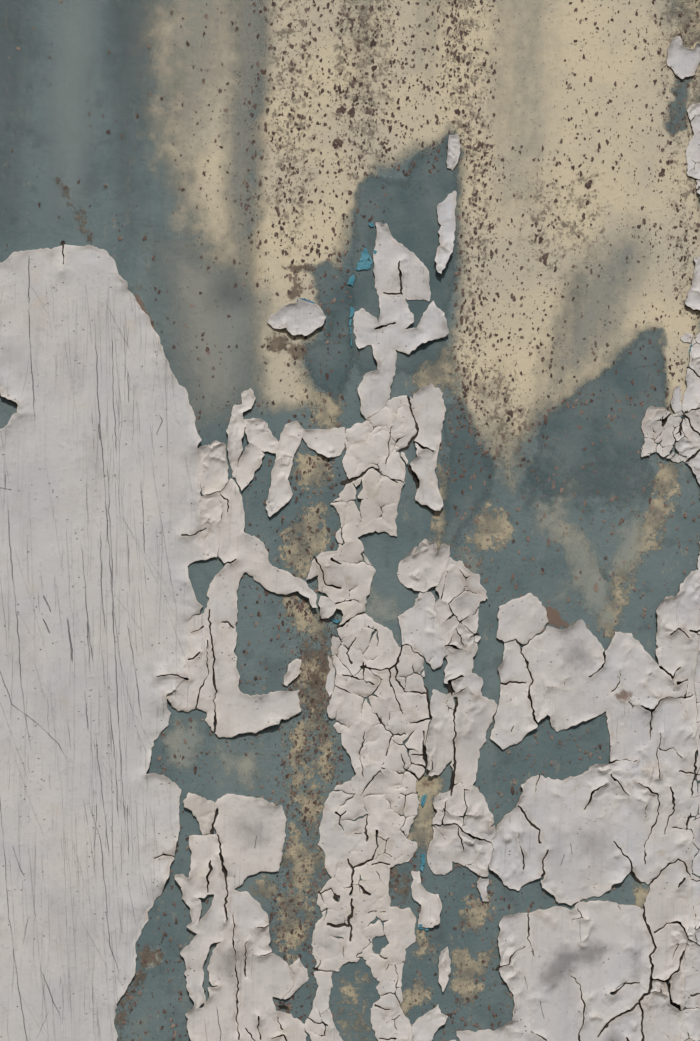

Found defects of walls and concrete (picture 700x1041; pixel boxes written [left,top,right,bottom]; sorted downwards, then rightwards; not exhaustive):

corrosion [134,0,700,634]
peeling [148,0,700,1041]
crack [661,412,700,462]
corrosion [115,811,193,1041]
corrosion [157,575,345,1019]
crack [318,811,389,940]
crack [313,556,490,850]
crack [495,914,534,980]
crack [501,648,537,724]
crack [518,774,565,878]
crack [571,666,700,1041]